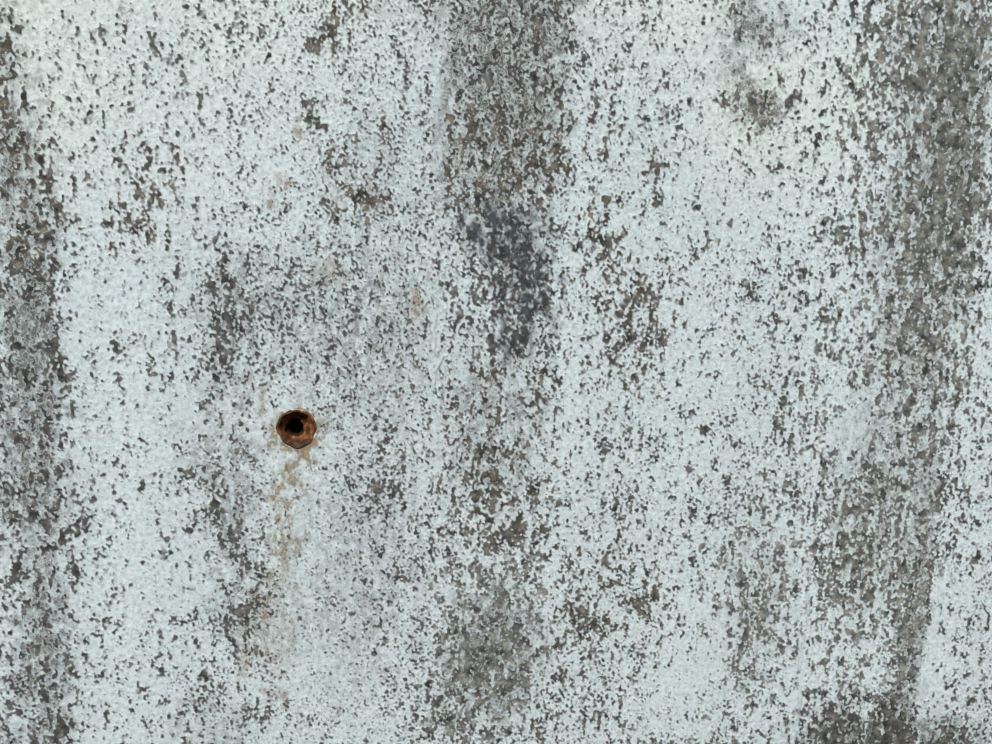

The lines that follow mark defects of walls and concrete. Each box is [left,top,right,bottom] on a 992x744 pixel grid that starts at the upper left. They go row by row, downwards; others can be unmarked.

water stain [0,96,69,531]
water stain [439,0,568,363]
water stain [913,144,973,277]
rust [251,412,327,619]
water stain [11,585,74,744]
water stain [444,581,537,719]
water stain [807,517,960,744]